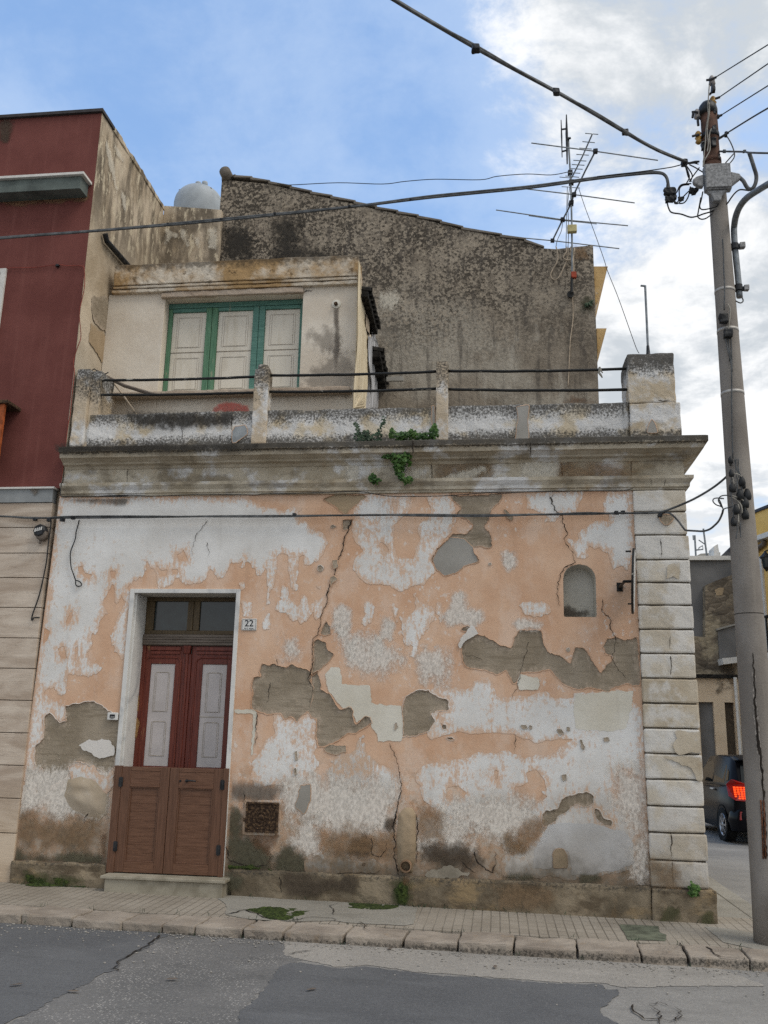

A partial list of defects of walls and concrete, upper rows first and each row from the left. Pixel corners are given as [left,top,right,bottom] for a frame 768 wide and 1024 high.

leakage [269,218,331,259]
leakage [380,293,398,310]
leakage [127,403,249,431]
crack [549,462,576,604]
crack [307,519,353,707]
peeling [20,491,649,881]
leakage [15,812,102,886]
leakage [227,784,358,896]
crack [371,743,419,873]
leakage [421,842,483,869]
leakage [504,833,526,854]